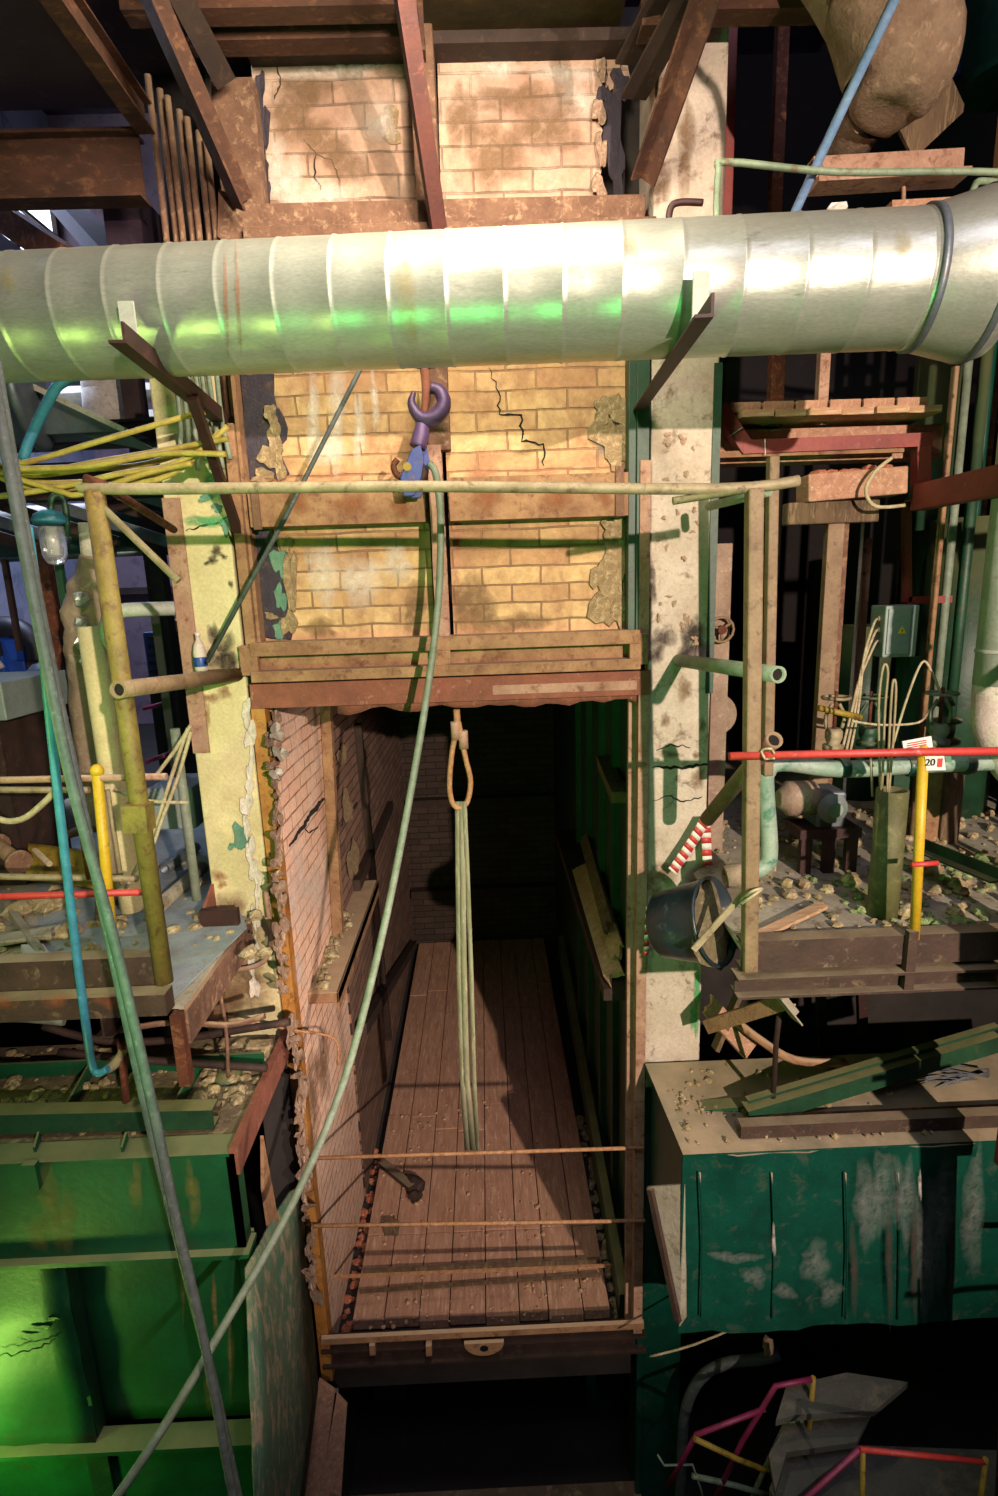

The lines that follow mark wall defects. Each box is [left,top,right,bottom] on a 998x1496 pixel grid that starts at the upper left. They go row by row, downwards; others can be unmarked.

spalling [591,57,629,195]
crack [489,368,546,466]
peeling [586,517,625,629]
spalling [228,697,320,998]
spalling [286,1012,324,1307]